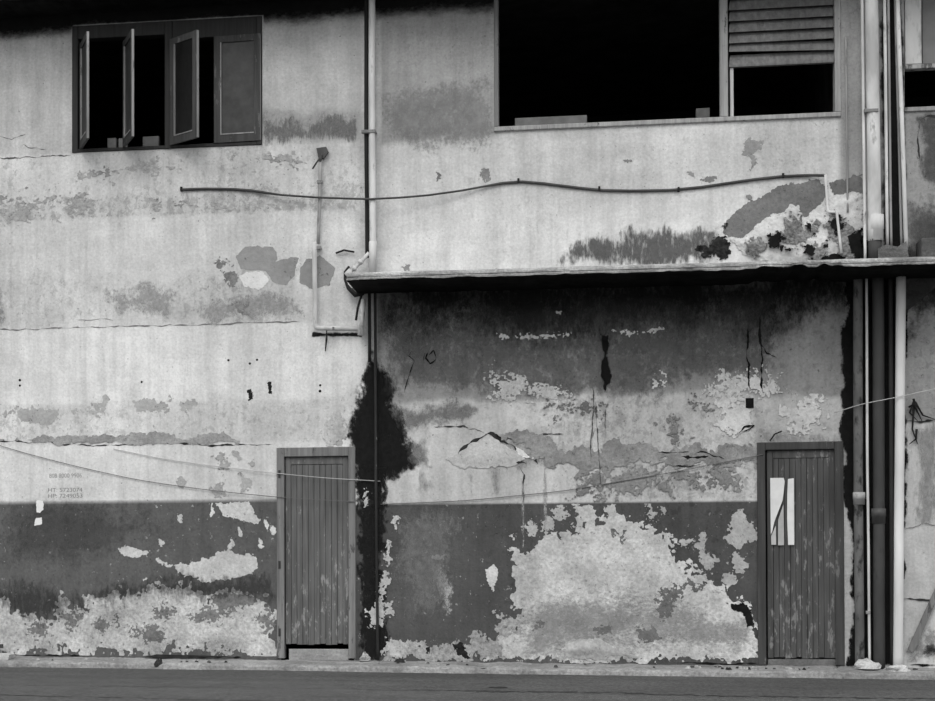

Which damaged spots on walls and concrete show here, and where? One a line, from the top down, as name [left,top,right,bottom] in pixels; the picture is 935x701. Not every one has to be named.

water stain [385,81,489,147]
spalling [741,137,764,171]
water stain [880,0,935,257]
spalling [214,256,239,287]
peeling [299,255,335,289]
water stain [560,226,715,265]
spalling [695,174,864,260]
peeling [779,394,830,437]
water stain [381,279,873,666]
water stain [884,280,935,665]
peeling [0,394,277,656]
peeling [364,392,758,664]